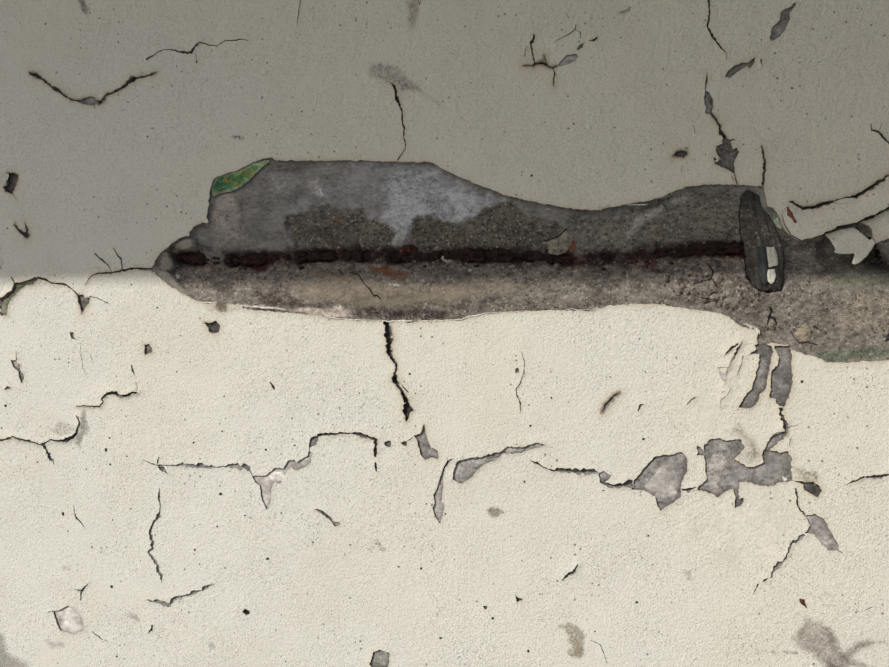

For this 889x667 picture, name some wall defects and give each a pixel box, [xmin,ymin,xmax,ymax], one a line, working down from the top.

crack [707,0,720,47]
crack [525,35,578,86]
crack [31,73,151,105]
crack [391,83,406,149]
crack [97,255,152,274]
crack [384,322,413,420]
spalling [150,158,889,587]
crack [0,391,137,460]
crack [850,474,889,483]
crack [148,462,252,607]
water stain [796,625,868,667]